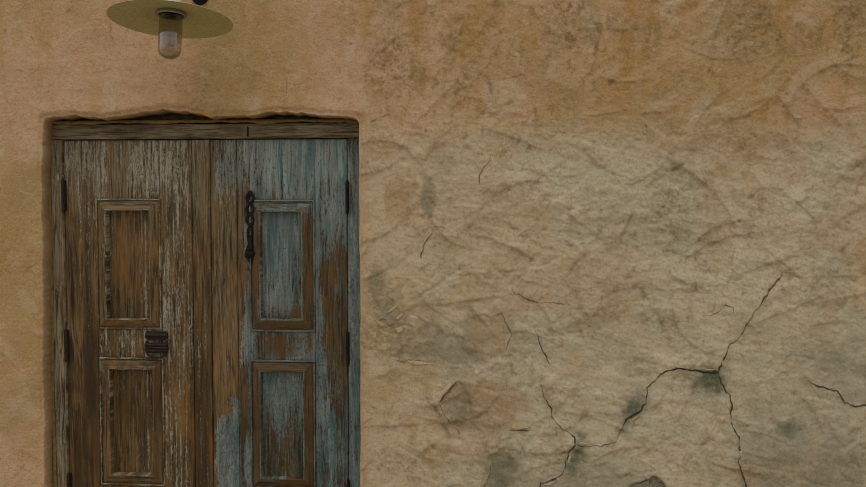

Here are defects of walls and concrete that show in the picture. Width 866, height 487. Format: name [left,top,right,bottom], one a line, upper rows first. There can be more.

crack [539,275,782,487]
crack [807,380,866,407]
flaking render [630,476,666,487]